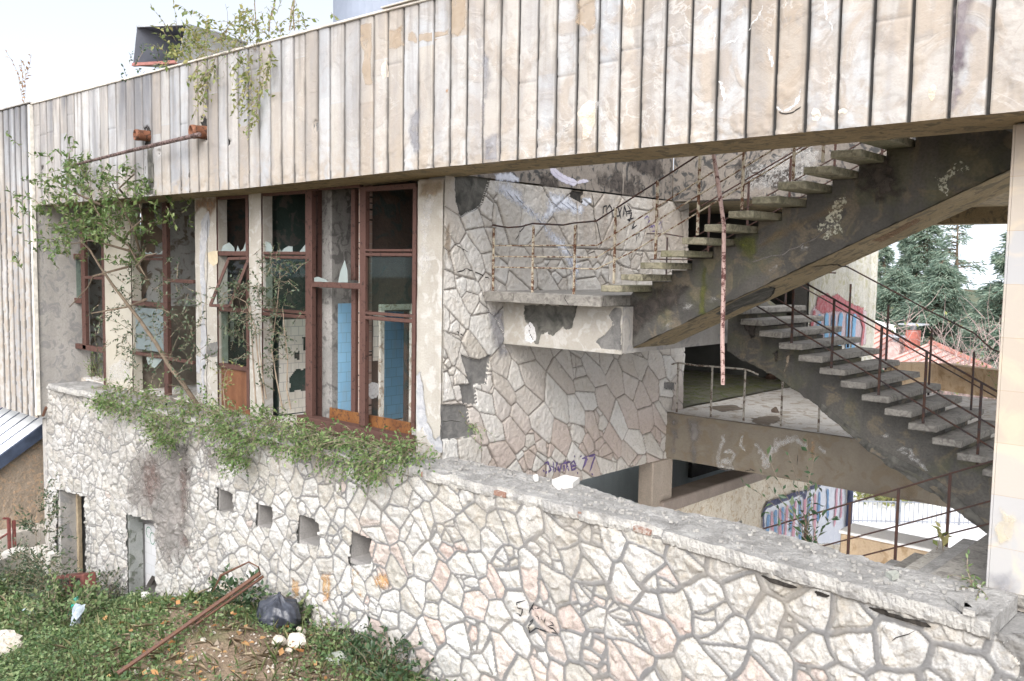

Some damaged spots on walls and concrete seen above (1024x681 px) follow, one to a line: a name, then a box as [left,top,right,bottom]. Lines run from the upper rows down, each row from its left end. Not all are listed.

spalling [524,304,577,344]
spalling [596,308,622,351]
water stain [128,446,190,561]